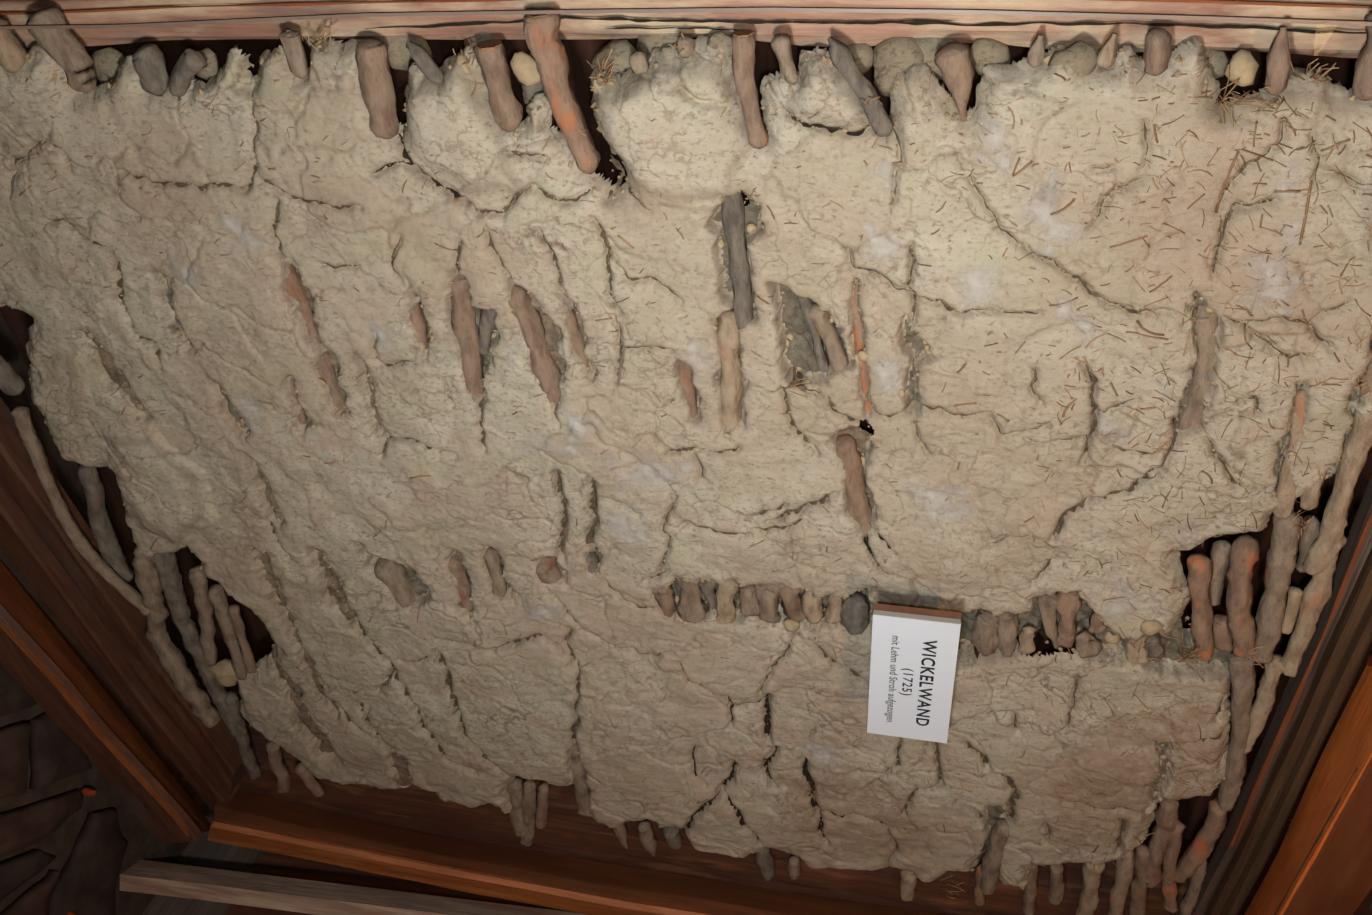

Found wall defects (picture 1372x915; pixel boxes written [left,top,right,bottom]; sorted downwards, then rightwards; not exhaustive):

crack [132,88,358,251]
crack [786,110,902,198]
crack [371,133,677,378]
spalling [85,331,145,411]
spalling [780,284,868,373]
crack [783,366,1238,580]
crack [557,469,836,609]
spalling [798,588,873,622]
spalling [958,609,979,650]
spalling [1017,598,1231,664]
crack [344,605,1051,862]
spalling [982,805,1006,852]